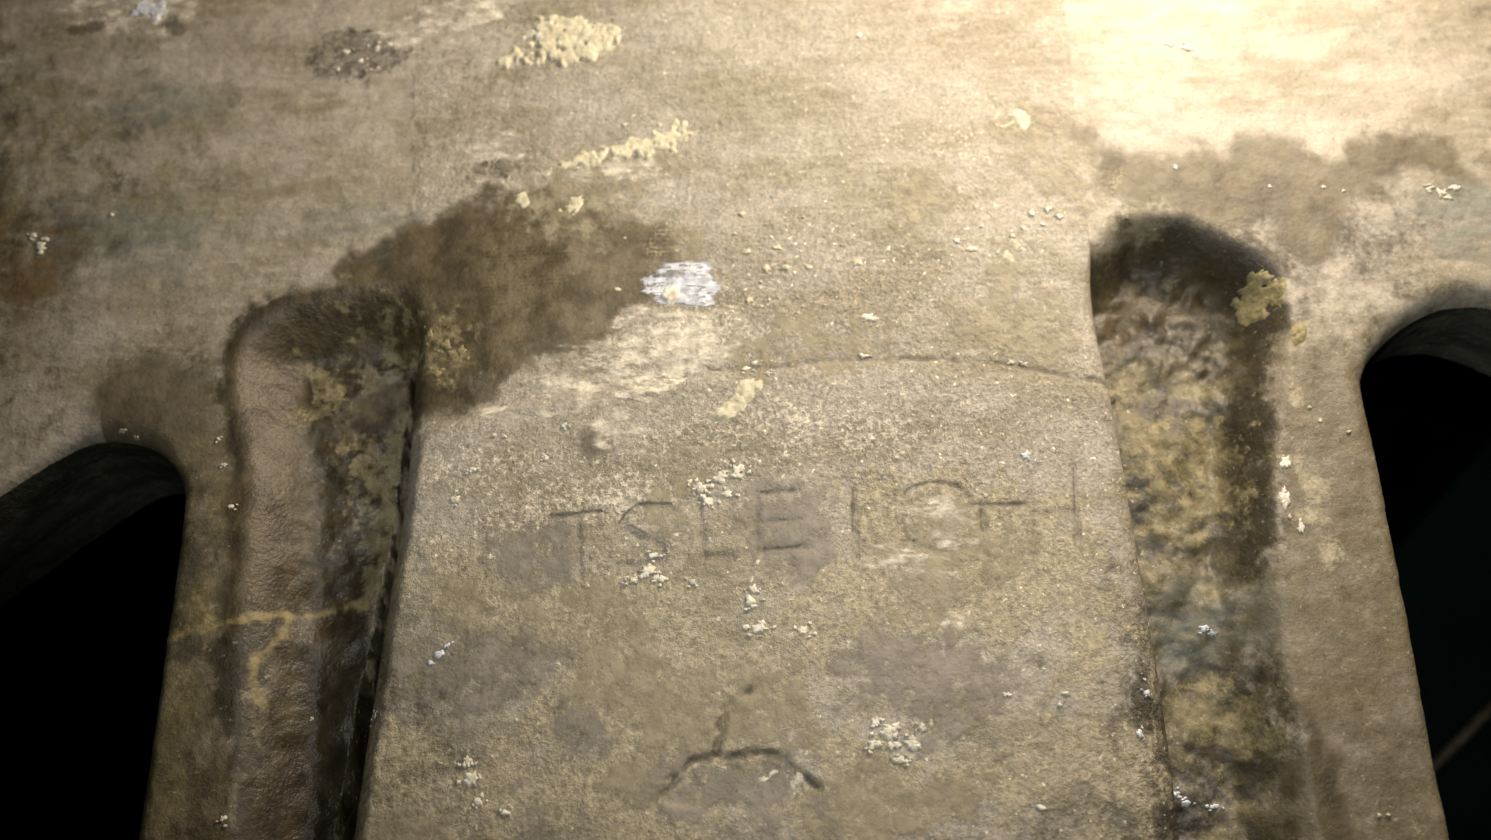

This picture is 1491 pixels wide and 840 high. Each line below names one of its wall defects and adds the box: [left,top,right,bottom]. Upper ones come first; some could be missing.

peeling [306,27,413,83]
leakage [1100,138,1491,257]
leakage [1090,259,1221,375]
leakage [220,126,741,840]
crack [167,591,369,709]
leakage [1285,743,1346,838]